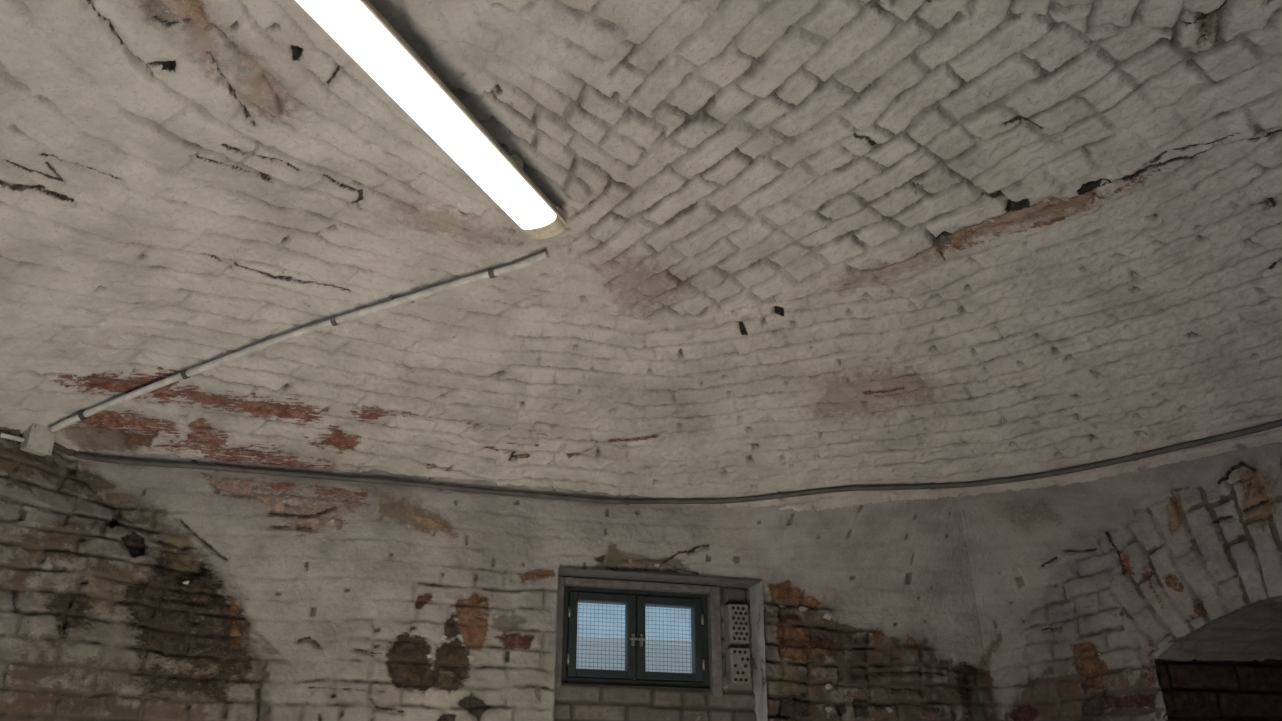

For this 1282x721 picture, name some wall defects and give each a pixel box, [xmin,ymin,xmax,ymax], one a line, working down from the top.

crack [87,0,153,77]
crack [327,65,340,84]
crack [0,153,118,202]
crack [196,144,363,203]
spalling [932,160,1161,252]
peeling [51,367,409,535]
peeling [484,428,546,461]
peeling [567,435,659,459]
peeling [1120,552,1207,616]
peeling [385,593,535,721]
peeling [775,607,836,718]
spalling [825,671,943,718]